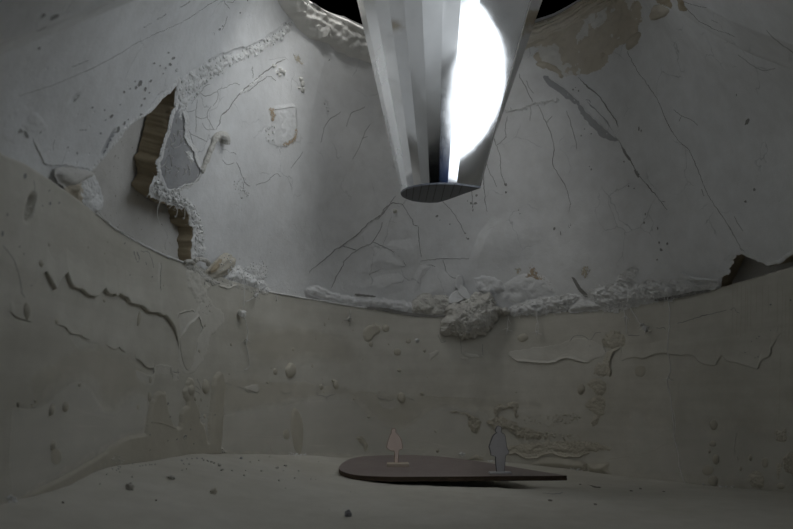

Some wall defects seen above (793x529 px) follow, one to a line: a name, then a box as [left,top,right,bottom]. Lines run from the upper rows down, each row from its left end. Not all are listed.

peeling [152,0,299,259]
crack [519,74,577,228]
crack [222,152,303,194]
crack [309,196,469,288]
peeling [33,244,180,350]
flaking render [218,265,271,292]
flaking render [306,285,413,313]
flaking render [508,293,603,320]
flaking render [717,254,736,277]